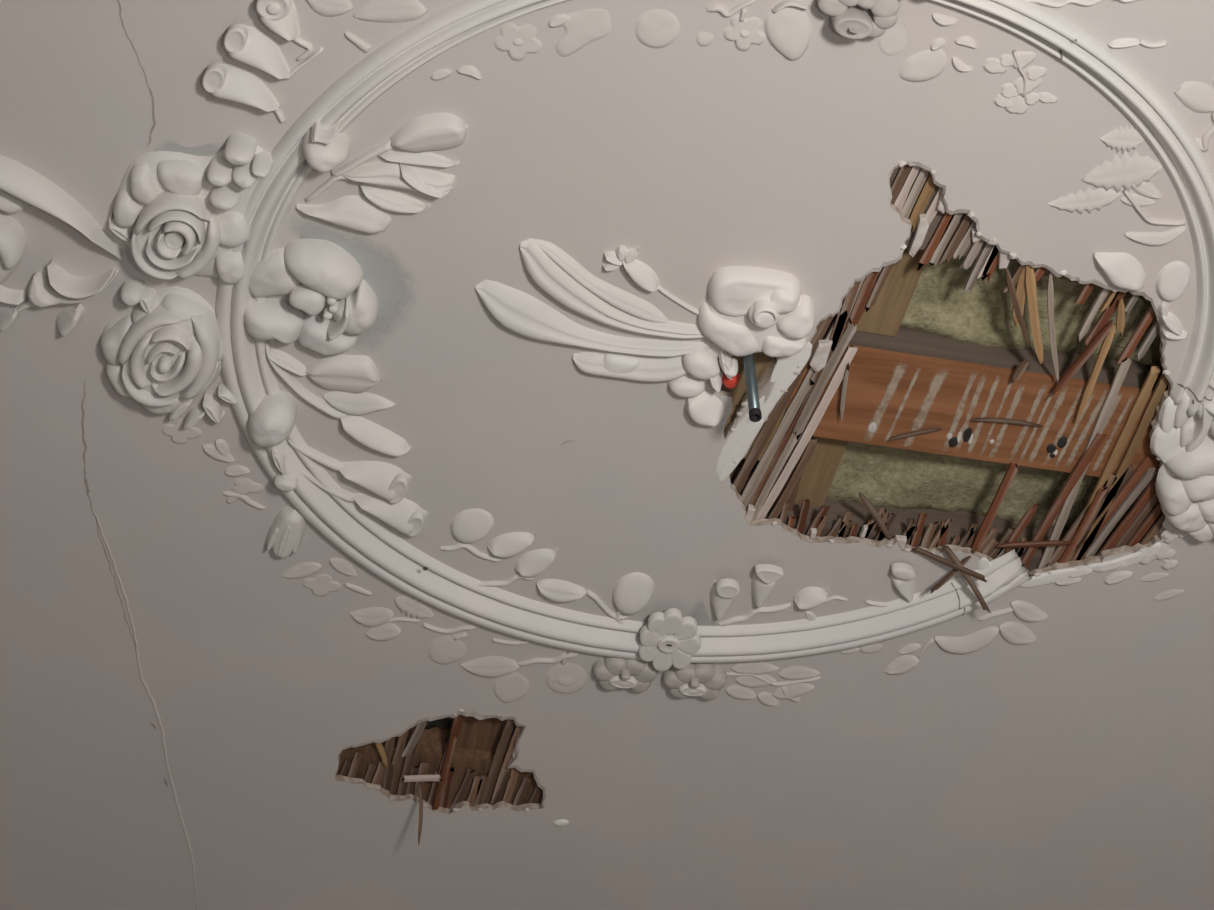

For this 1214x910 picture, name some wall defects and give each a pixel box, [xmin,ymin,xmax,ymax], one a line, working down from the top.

crack [117,0,155,146]
flaking render [716,161,1214,588]
crack [81,381,198,910]
flaking render [335,709,546,814]